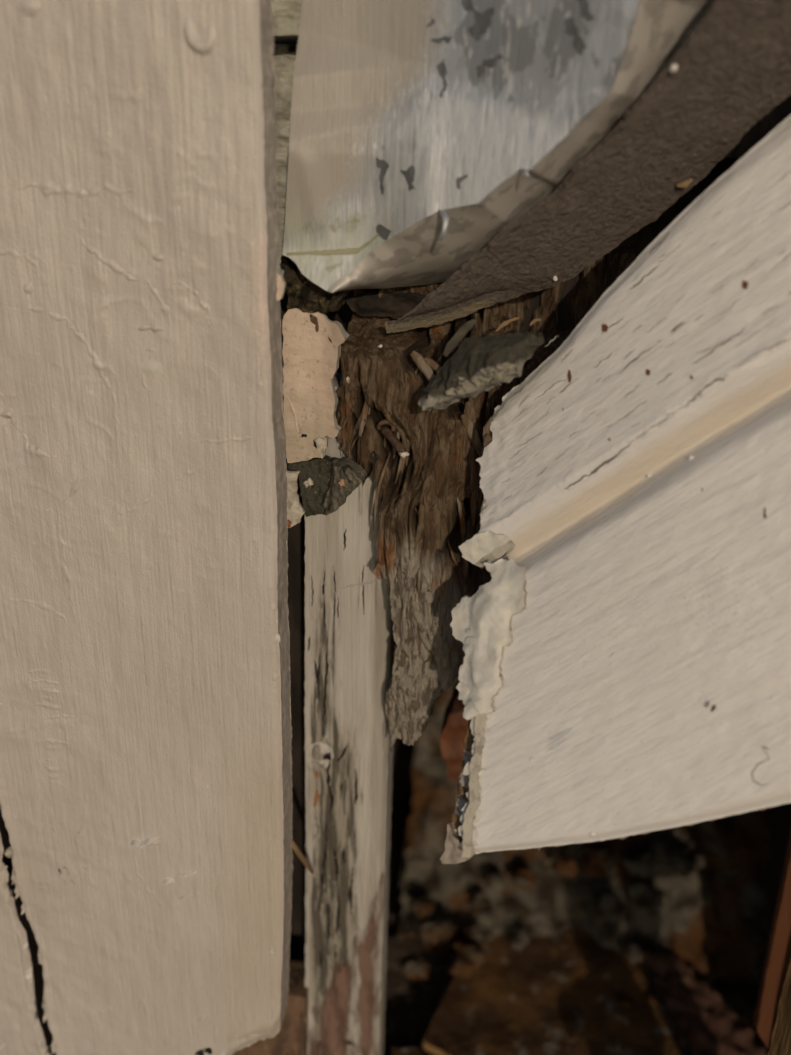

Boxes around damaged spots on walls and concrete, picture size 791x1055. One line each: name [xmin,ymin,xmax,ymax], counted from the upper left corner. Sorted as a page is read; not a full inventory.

crack [629,177,729,291]
peeling [445,361,514,396]
crack [497,249,791,521]
peeling [450,531,527,858]
crack [0,859,58,1055]
damp [309,898,383,1055]